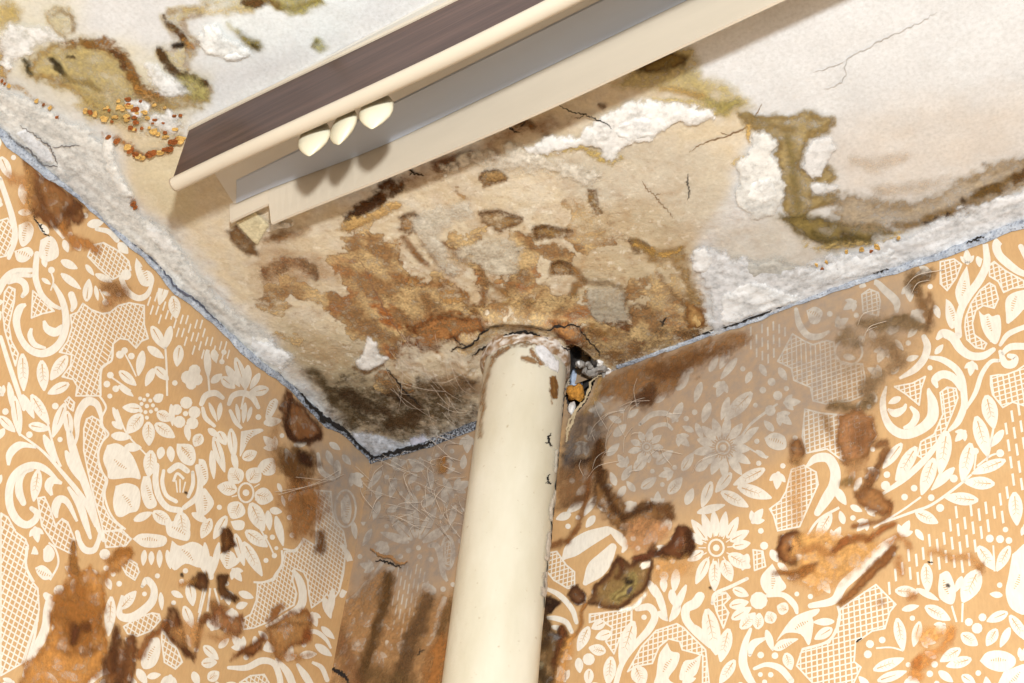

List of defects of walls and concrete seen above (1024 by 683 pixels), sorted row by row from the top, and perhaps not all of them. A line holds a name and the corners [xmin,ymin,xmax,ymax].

leakage [23,0,323,123]
crack [815,12,937,89]
corrosion [83,91,186,160]
peeling [441,98,716,185]
peeling [733,132,786,220]
peeling [803,137,837,194]
leakage [621,50,1024,270]
peeling [691,191,1024,335]
crack [451,324,600,357]
leakage [256,178,746,683]
leakage [775,270,932,605]
leakage [19,541,313,683]